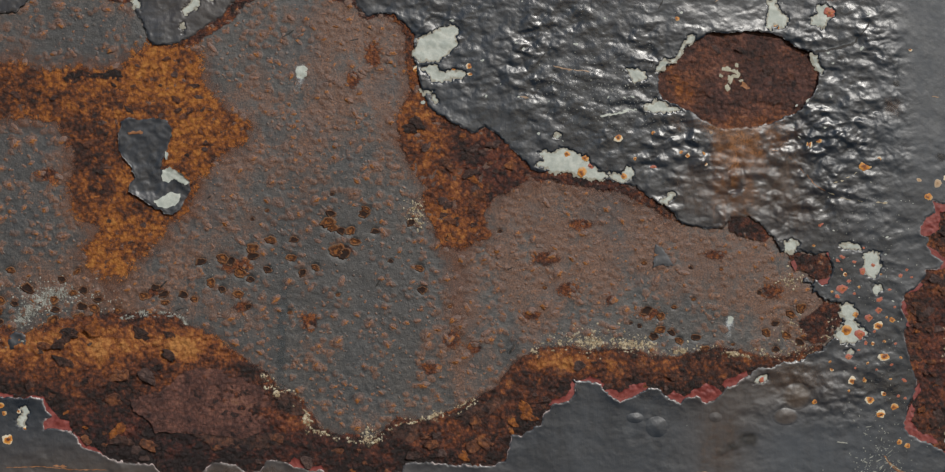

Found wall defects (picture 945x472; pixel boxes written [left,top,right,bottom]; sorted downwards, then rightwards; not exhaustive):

peeling [412,24,466,104]
peeling [626,34,695,84]
peeling [644,97,680,114]
rust [658,31,819,185]
peeling [118,117,191,215]
peeling [535,131,634,183]
rust [728,216,769,242]
rust [786,251,832,285]
rust [830,268,851,298]
peeling [833,302,868,355]
rust [845,193,945,452]
rust [0,302,842,472]